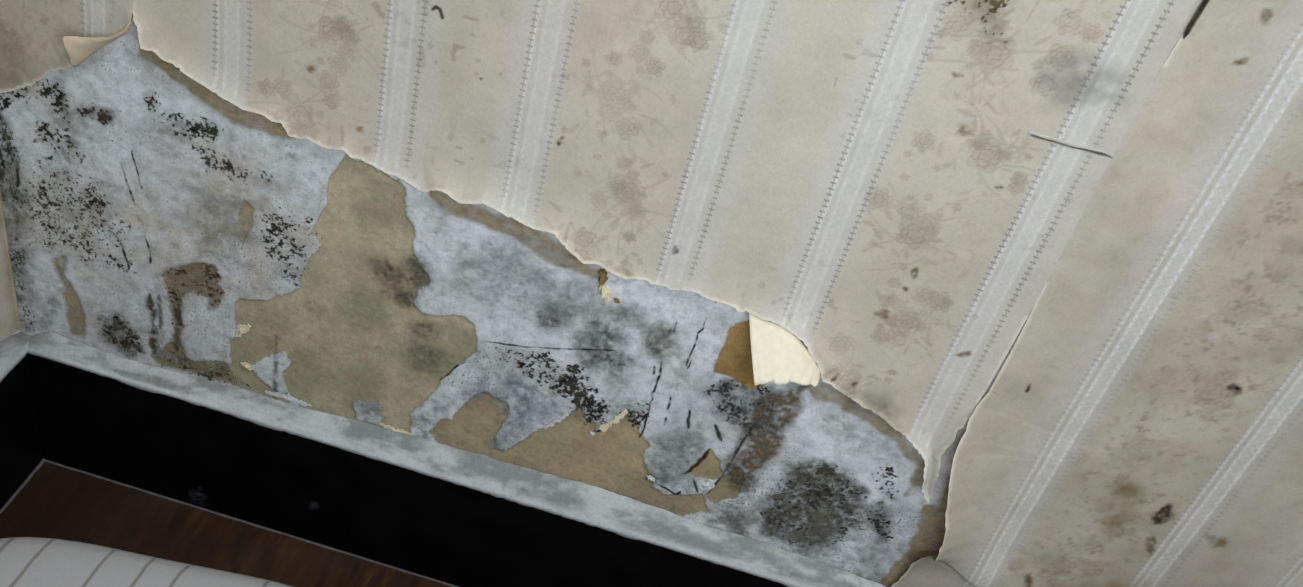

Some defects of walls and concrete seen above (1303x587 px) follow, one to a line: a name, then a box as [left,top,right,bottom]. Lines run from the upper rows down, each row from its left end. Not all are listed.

mould [144,92,273,185]
mould [0,80,136,331]
mould [203,201,317,287]
peeling [54,259,85,335]
mould [97,293,182,356]
peeling [151,154,744,516]
mould [477,309,649,445]
damp [648,329,673,355]
damp [707,380,807,490]
damp [760,462,899,548]
damp [1148,505,1172,553]